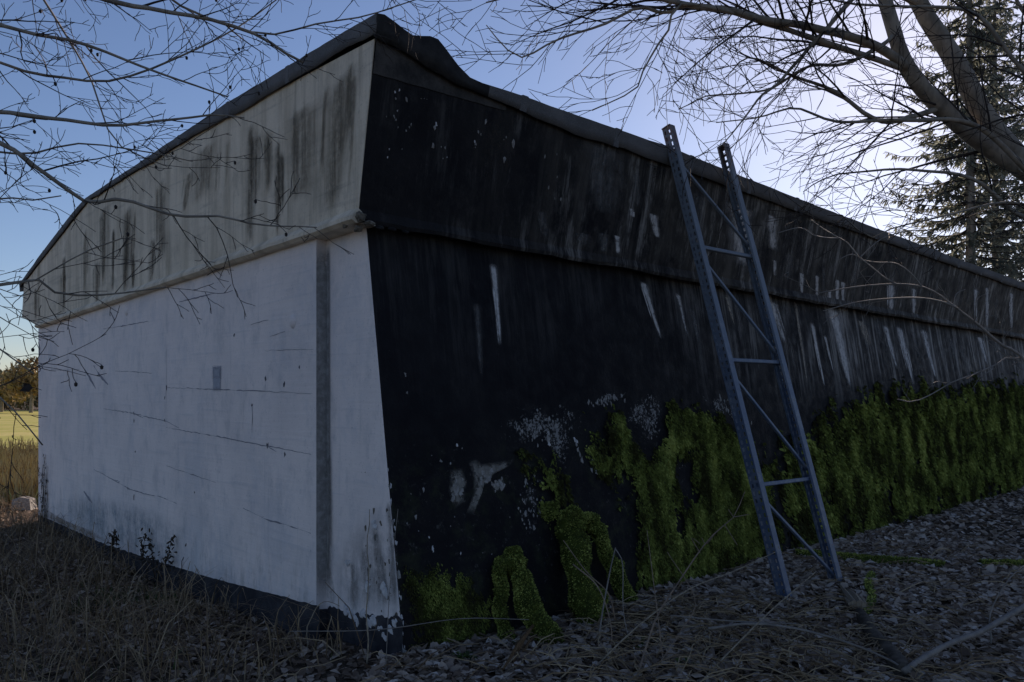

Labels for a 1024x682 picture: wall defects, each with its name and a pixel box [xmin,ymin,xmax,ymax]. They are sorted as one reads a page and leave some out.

damp [248,112,306,228]
damp [84,211,135,299]
damp [650,214,659,237]
damp [768,216,776,248]
damp [491,266,500,340]
damp [641,283,660,335]
damp [795,273,850,383]
damp [859,321,913,378]
crack [107,367,311,455]
spalling [364,468,434,552]
spalling [431,455,507,509]
peeling [343,558,407,653]